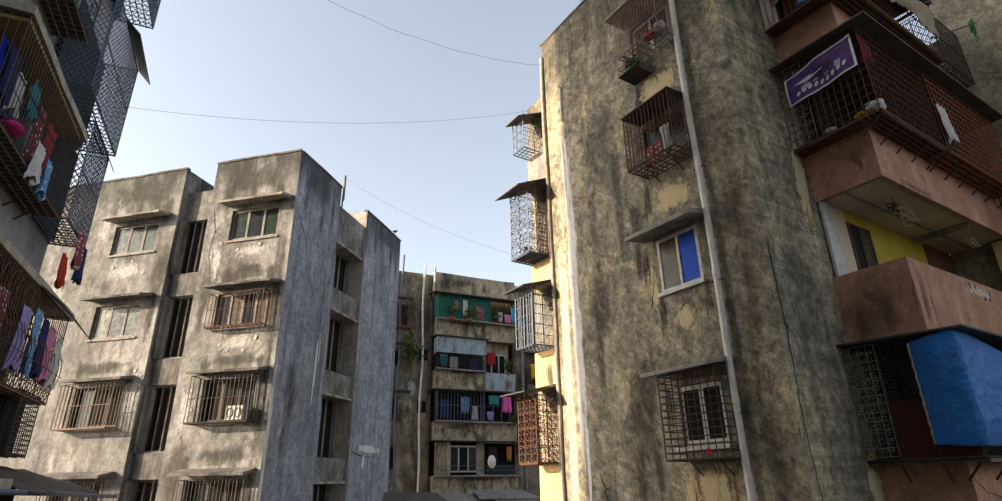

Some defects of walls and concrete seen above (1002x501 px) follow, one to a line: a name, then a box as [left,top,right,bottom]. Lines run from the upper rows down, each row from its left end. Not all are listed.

water stain [225,165,284,210]
water stain [637,248,650,283]
water stain [196,238,294,501]
water stain [310,337,321,408]
water stain [167,443,242,501]
water stain [358,445,380,470]
water stain [631,370,664,501]
water stain [684,461,735,501]